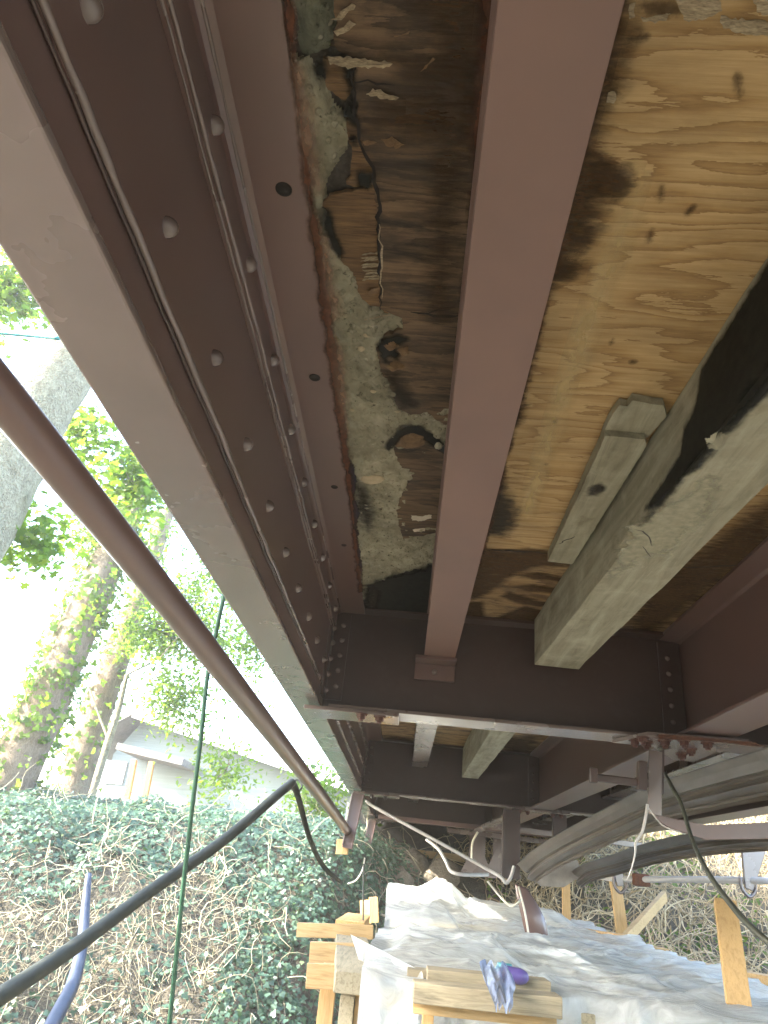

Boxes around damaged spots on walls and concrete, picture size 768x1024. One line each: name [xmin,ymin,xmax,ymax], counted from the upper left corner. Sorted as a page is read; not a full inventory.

rust [284,0,363,593]
peeling [330,3,356,36]
spalling [290,52,449,600]
crack [350,67,395,308]
water stain [371,0,480,322]
water stain [550,0,639,289]
water stain [349,463,432,613]